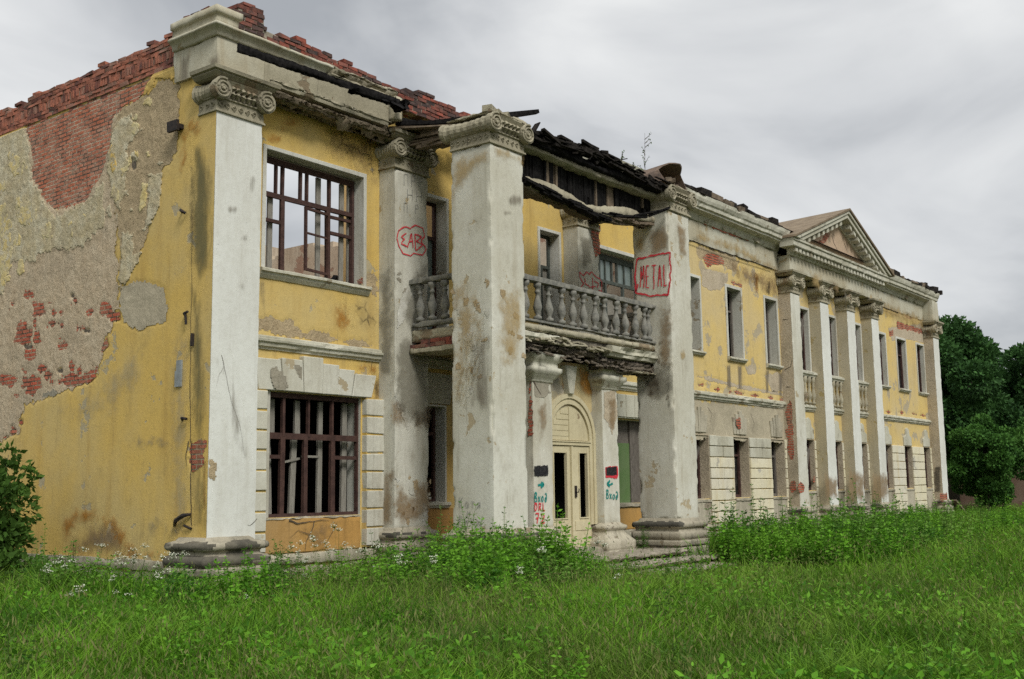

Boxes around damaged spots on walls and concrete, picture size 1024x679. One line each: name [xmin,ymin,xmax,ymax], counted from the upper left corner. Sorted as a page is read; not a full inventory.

peeling [0,68,180,442]
leakage [191,150,207,270]
spalling [525,341,656,377]
flaking render [189,438,217,480]
peeling [694,364,794,459]
flaking render [789,476,815,493]